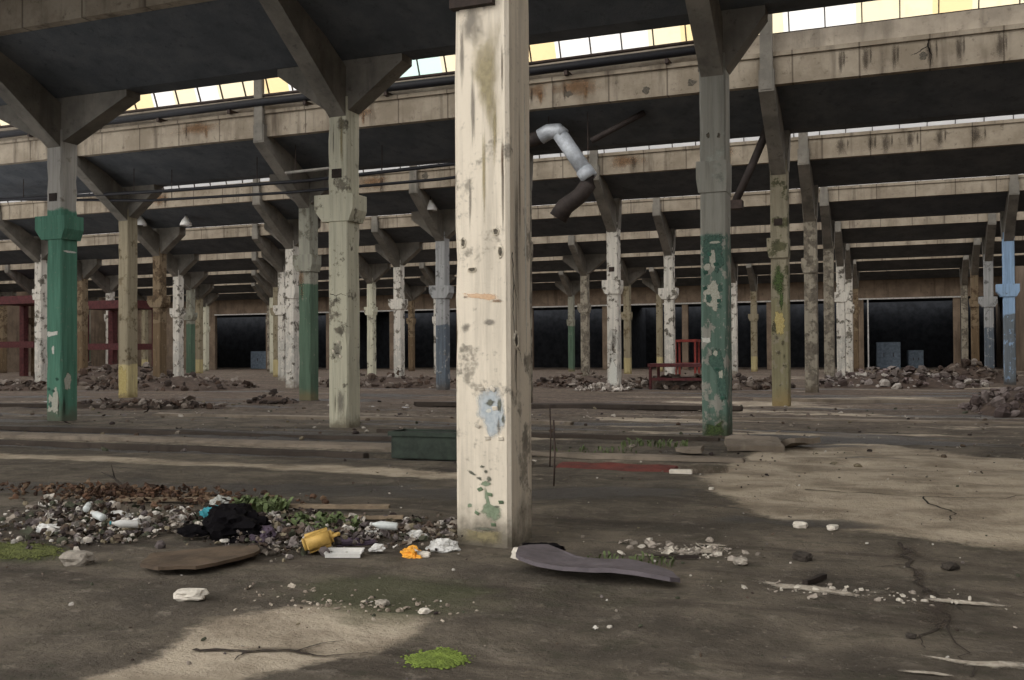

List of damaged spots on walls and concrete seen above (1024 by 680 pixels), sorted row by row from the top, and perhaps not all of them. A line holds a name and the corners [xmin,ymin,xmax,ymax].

leakage [471,50,496,198]
peeling [702,235,724,311]
peeling [774,311,785,358]
peeling [47,373,71,414]
peeling [475,386,505,441]
peeling [702,337,726,402]
peeling [468,465,504,531]
crack [805,489,982,521]
crack [881,542,976,676]